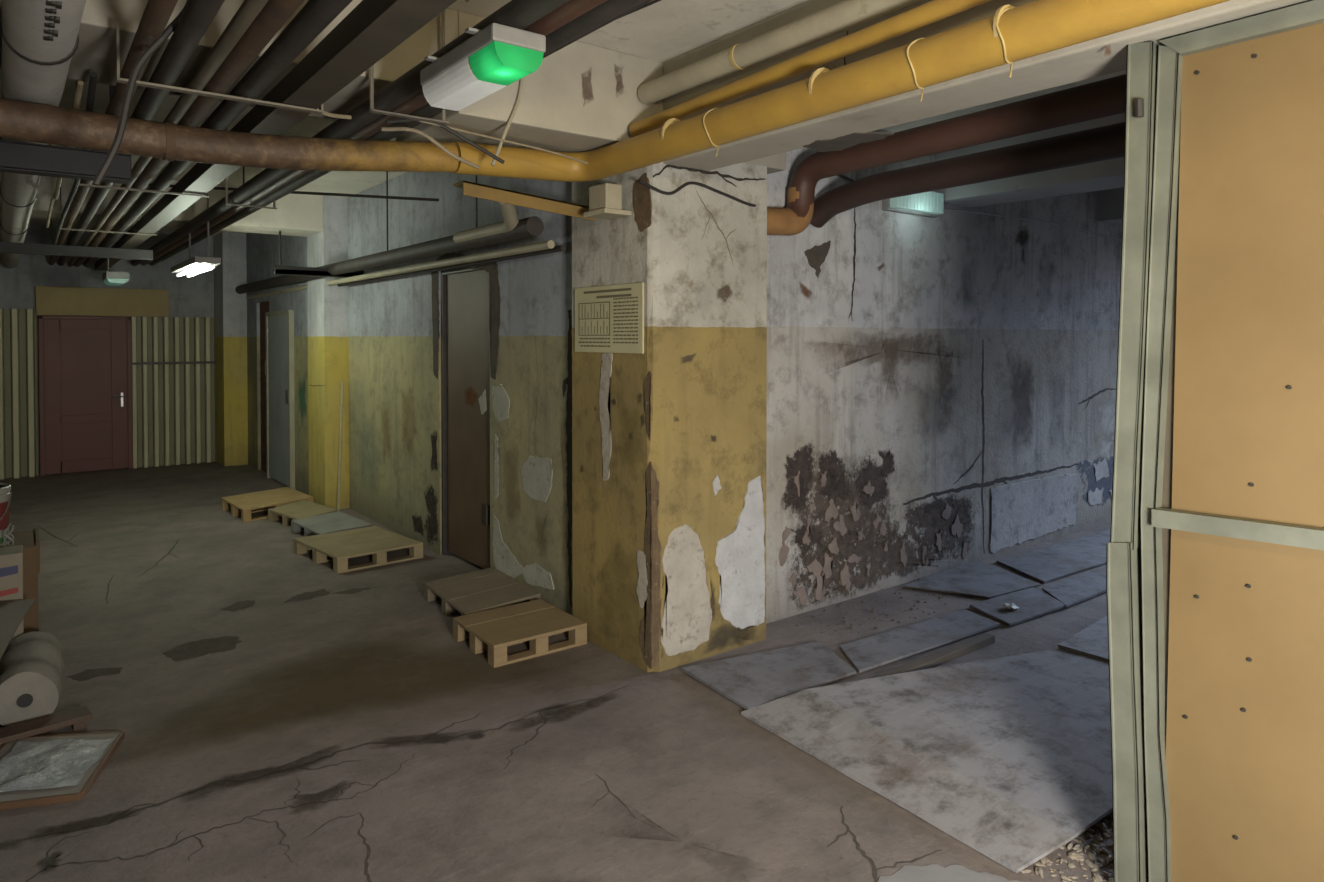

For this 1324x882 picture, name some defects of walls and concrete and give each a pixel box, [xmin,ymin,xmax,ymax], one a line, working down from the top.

spalling [641,371,652,441]
peeling [492,434,554,590]
peeling [636,462,969,669]
crack [0,686,627,882]
crack [590,774,635,818]
crack [827,806,941,882]